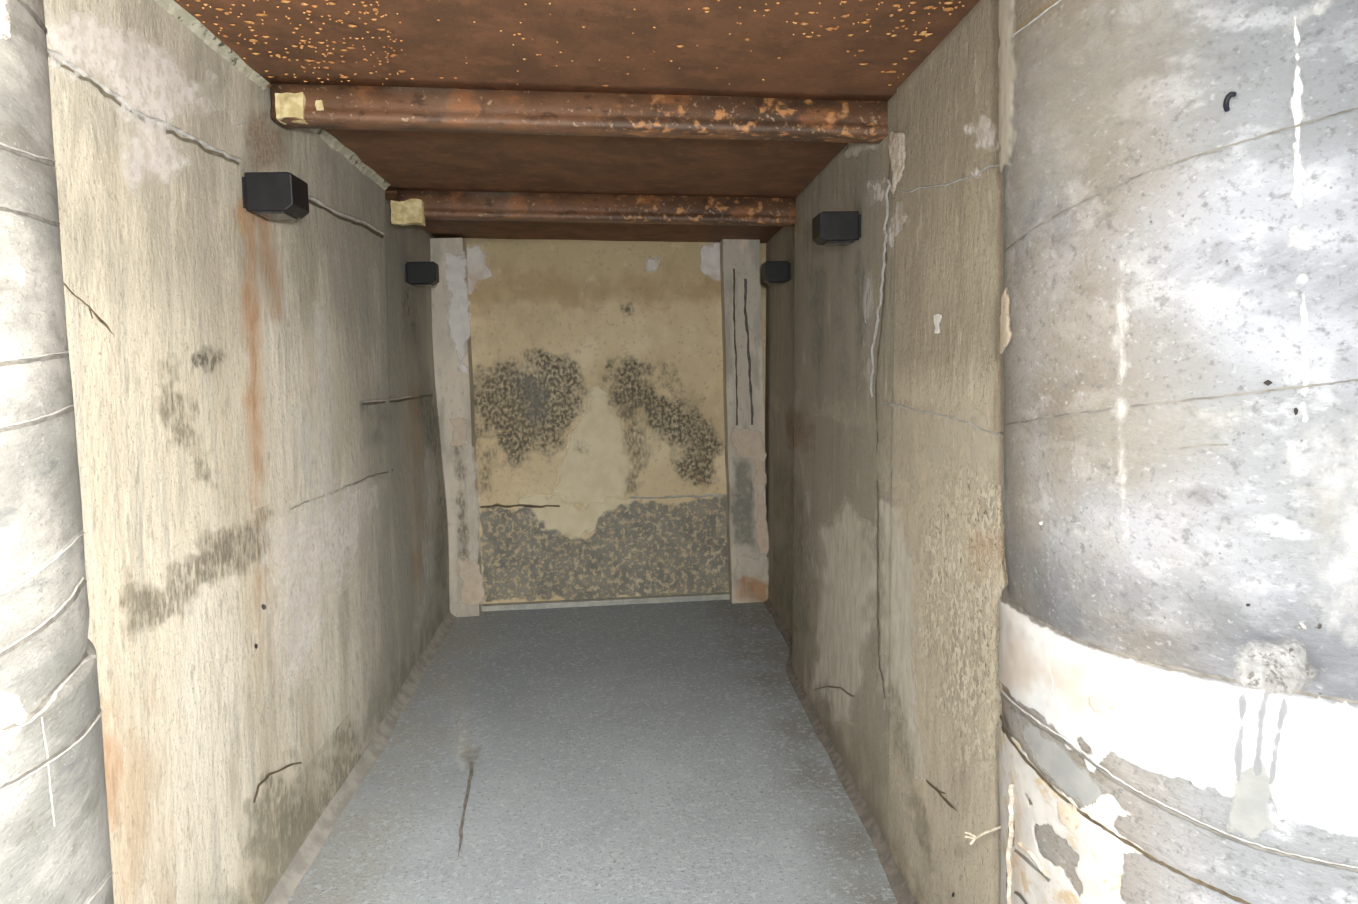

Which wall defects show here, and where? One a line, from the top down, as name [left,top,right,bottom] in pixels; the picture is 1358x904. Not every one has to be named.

spalling [0,0,11,40]
rust [177,0,414,84]
rust [786,0,965,86]
leakage [420,349,753,615]
leakage [120,409,382,677]
spalling [0,690,28,742]
peeling [999,599,1358,904]
crack [458,762,473,857]